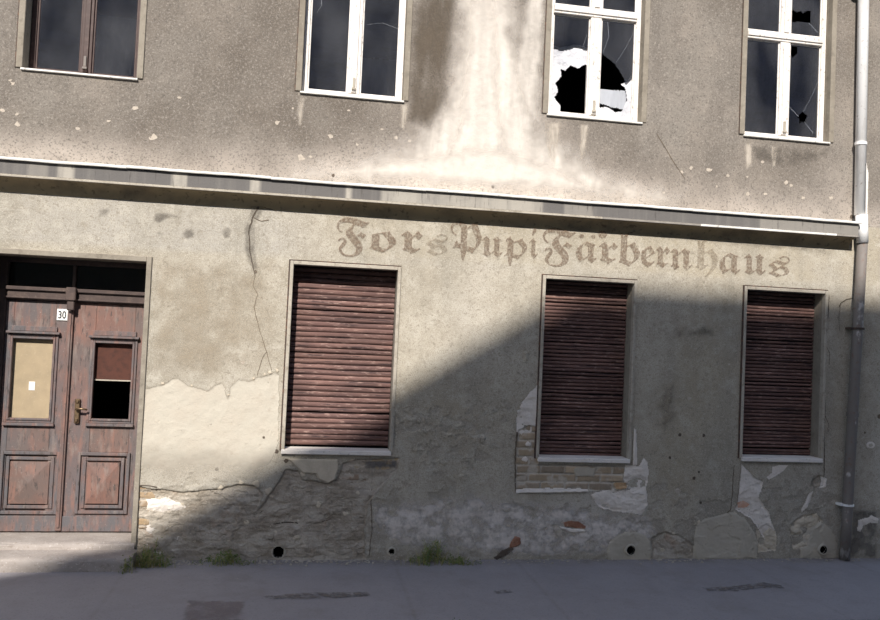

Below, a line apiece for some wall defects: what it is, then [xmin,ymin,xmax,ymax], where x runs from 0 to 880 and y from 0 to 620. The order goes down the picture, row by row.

damp [338,0,602,192]
crack [248,206,277,375]
flaking render [136,368,400,561]
flaking render [560,521,586,533]
flaking render [515,386,649,515]
flaking render [734,464,788,553]
flaking render [790,475,827,549]